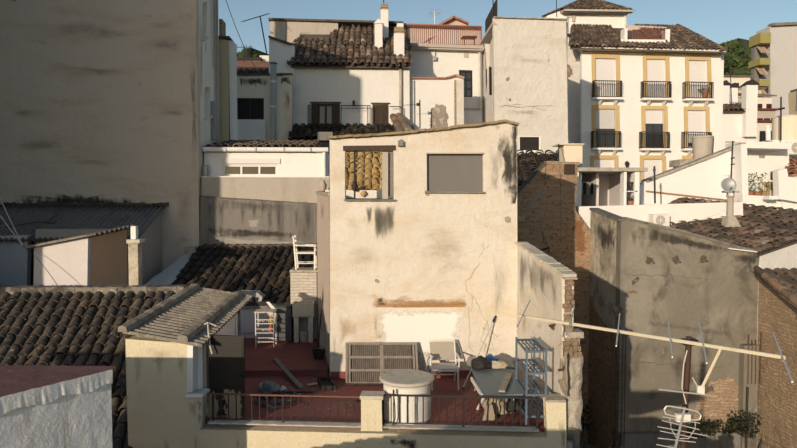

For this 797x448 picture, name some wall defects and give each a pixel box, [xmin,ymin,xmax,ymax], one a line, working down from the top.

leakage [27,194,112,206]
leakage [367,211,393,231]
leakage [500,126,518,204]
leakage [597,227,614,249]
crack [465,246,500,351]
spalling [558,280,582,398]